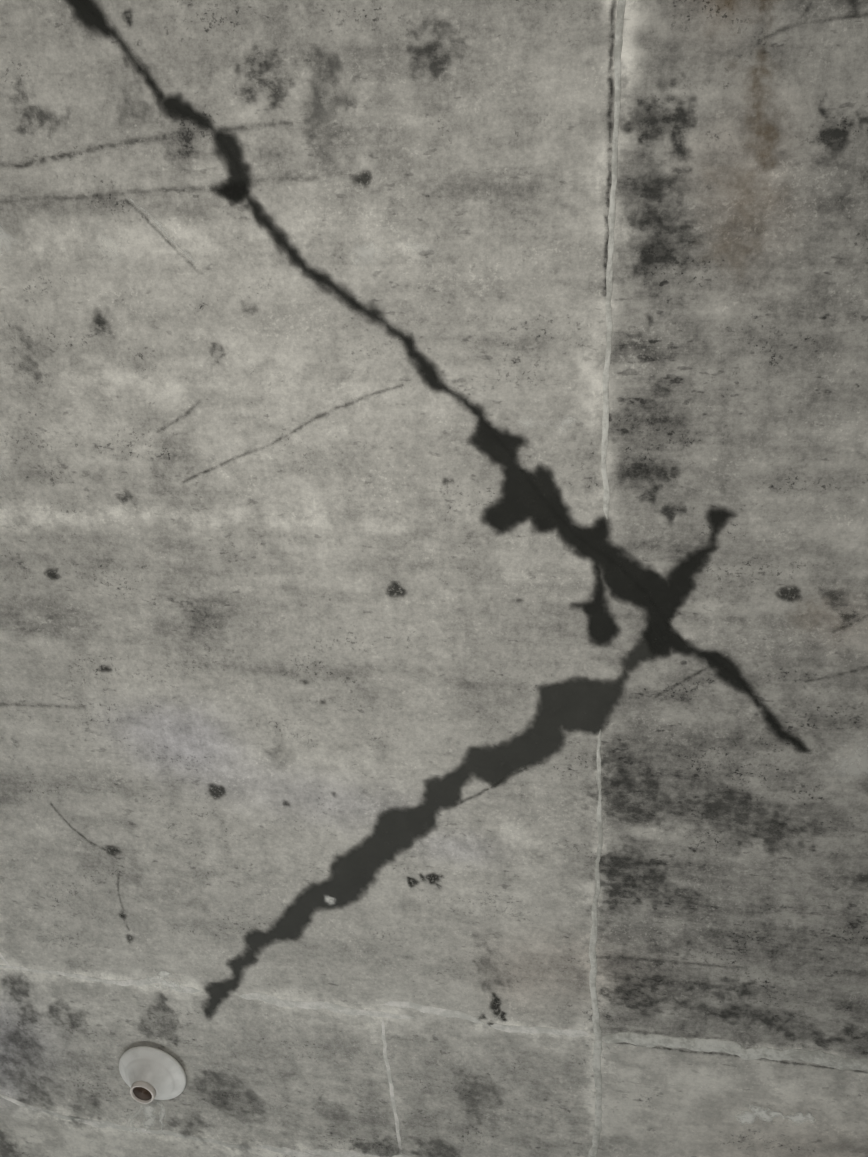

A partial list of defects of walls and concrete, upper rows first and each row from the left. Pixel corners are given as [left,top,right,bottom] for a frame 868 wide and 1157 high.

crack [604,6,614,289]
leakage [818,117,868,150]
leakage [66,0,807,1018]
leakage [812,1026,868,1053]